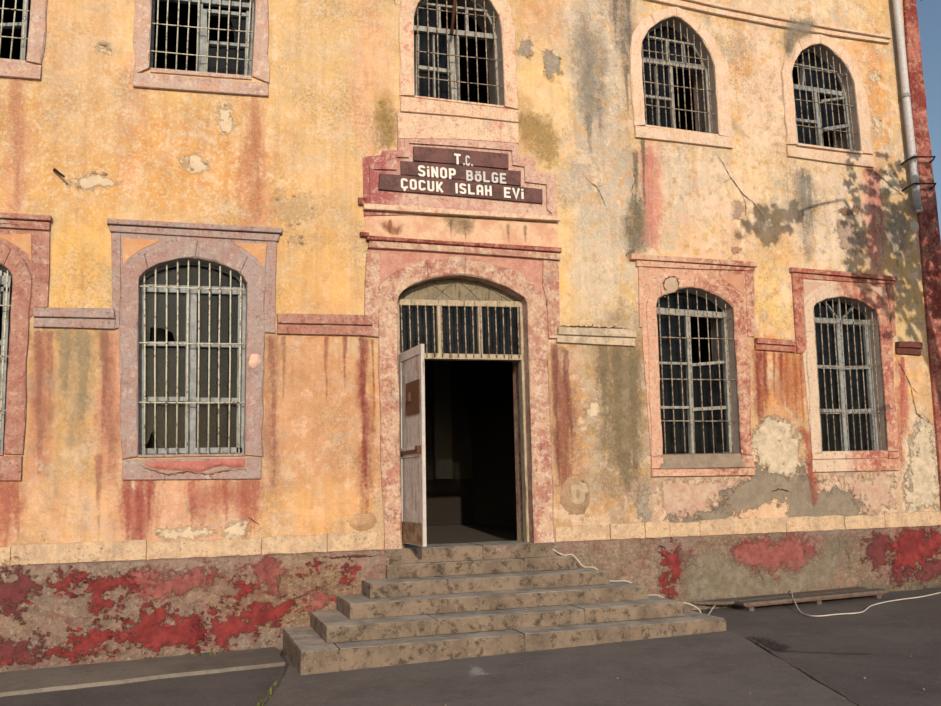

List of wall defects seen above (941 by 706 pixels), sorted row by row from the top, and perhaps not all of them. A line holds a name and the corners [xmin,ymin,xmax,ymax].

water stain [577,27,603,136]
water stain [614,0,631,102]
peeling [66,171,117,190]
peeling [177,152,211,174]
water stain [625,139,645,254]
crack [718,156,766,224]
water stain [599,345,639,485]
corrosion [755,353,803,410]
flaking render [751,414,808,480]
peeling [635,476,819,581]
flaking render [817,414,941,589]
peeling [0,552,362,669]